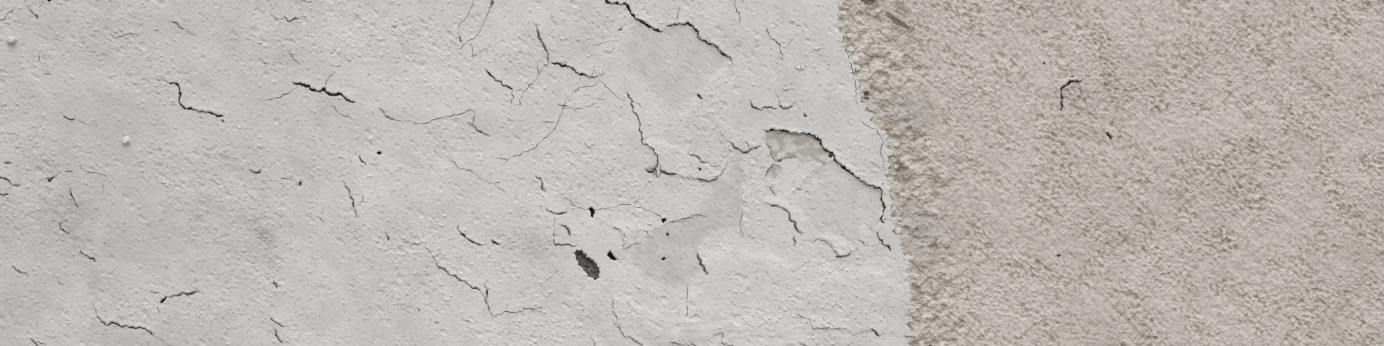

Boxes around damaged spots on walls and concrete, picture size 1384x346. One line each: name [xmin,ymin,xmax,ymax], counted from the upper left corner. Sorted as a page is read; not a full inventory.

crack [0,162,107,261]
crack [155,79,224,122]
crack [259,0,892,257]
peeling [575,0,968,346]
crack [12,264,63,285]
crack [94,291,198,346]
crack [387,227,543,324]